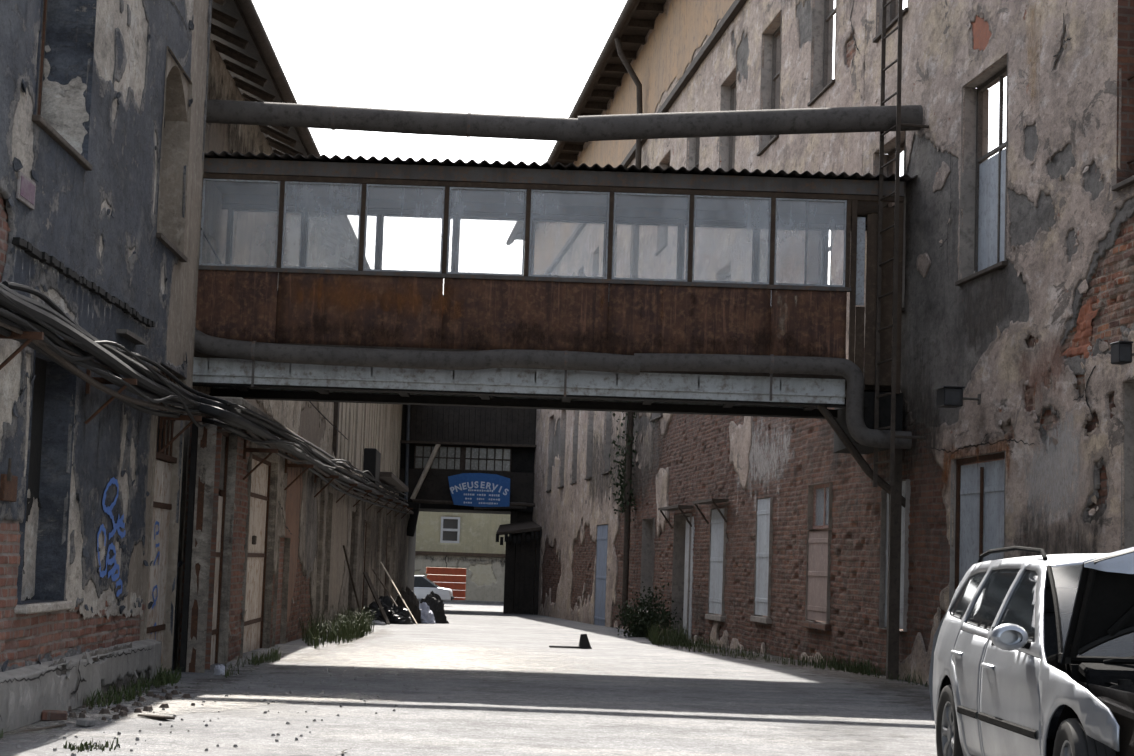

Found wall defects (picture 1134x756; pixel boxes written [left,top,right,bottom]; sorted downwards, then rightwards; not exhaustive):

peeling [12,32,89,182]
peeling [92,0,151,123]
flaking render [732,31,749,82]
flaking render [796,0,814,49]
flaking render [846,33,856,68]
flaking render [965,12,992,51]
flaking render [1024,123,1104,200]
flaking render [1024,197,1134,454]
flaking render [612,134,1056,675]
flaking render [0,339,157,680]
flaking render [1083,458,1109,523]
flaking render [542,519,596,611]